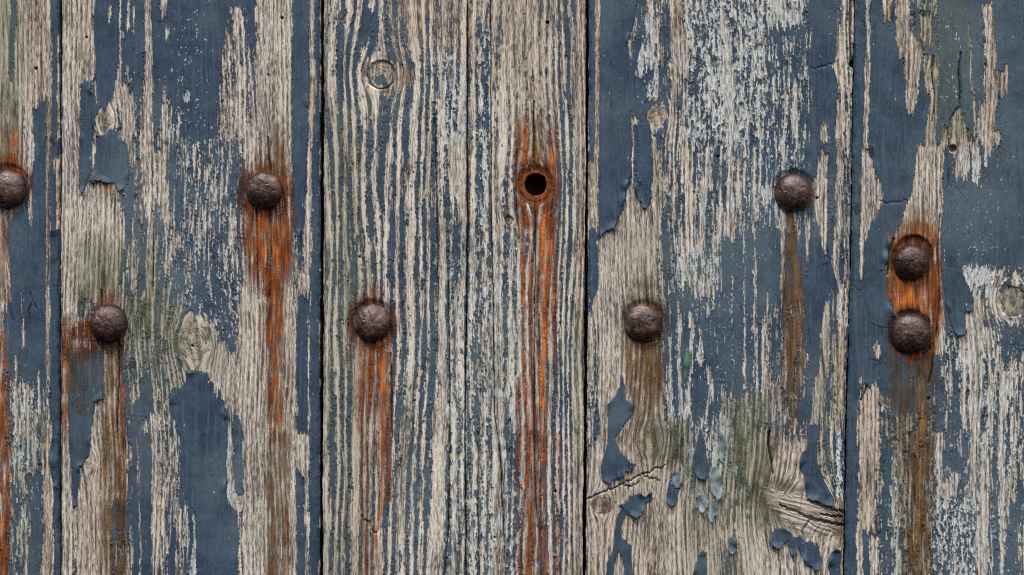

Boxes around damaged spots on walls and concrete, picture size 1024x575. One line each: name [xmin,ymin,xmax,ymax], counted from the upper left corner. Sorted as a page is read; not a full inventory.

peeling [0,0,169,575]
corrosion [62,294,125,575]
peeling [169,371,248,575]
corrosion [238,132,291,575]
peeling [292,0,320,303]
corrosion [348,287,395,575]
corrosion [515,123,559,575]
peeling [592,0,669,485]
corrosion [624,282,663,420]
peeling [799,378,886,537]
peeling [812,0,1010,437]
corrosion [888,209,943,575]